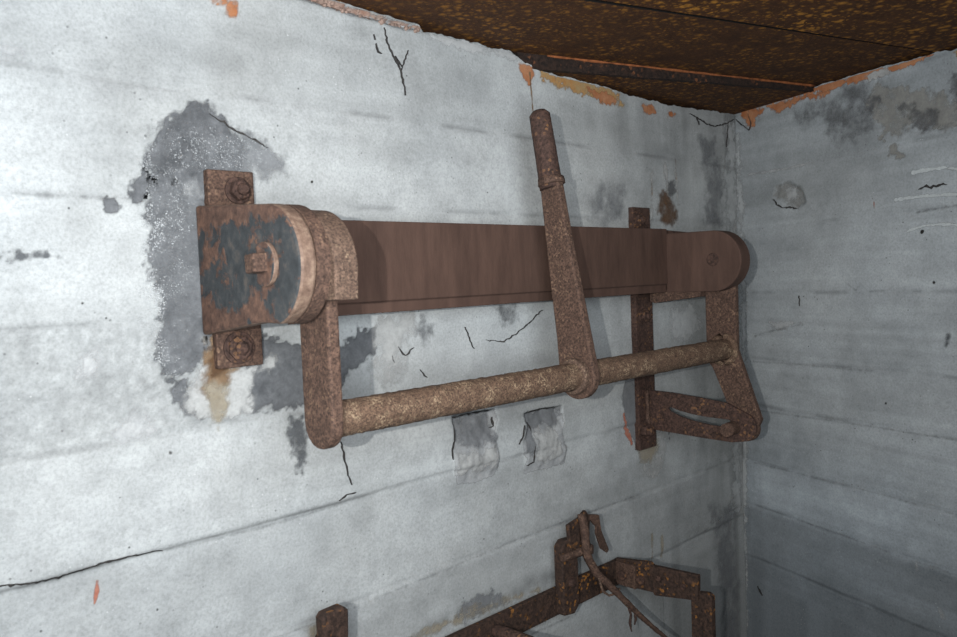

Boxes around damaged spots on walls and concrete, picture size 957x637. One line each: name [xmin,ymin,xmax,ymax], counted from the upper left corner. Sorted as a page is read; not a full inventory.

rust [216,0,238,17]
crack [373,27,409,95]
rust [519,64,624,110]
crack [691,114,751,147]
rust [547,54,934,127]
damp [804,87,881,127]
damp [899,103,939,131]
damp [103,196,120,213]
damp [128,99,304,420]
crack [464,310,543,349]
rust [202,337,238,422]
crack [0,550,163,588]